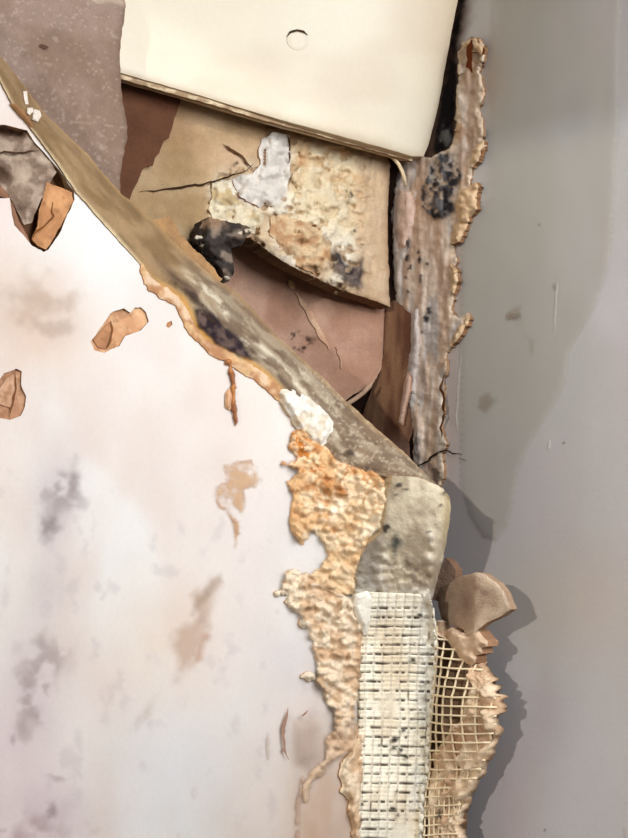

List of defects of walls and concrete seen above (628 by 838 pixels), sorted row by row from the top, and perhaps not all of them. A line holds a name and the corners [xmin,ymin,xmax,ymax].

water stain [421,0,464,219]
crack [139,144,253,192]
peeling [470,140,488,168]
flaking render [130,99,391,310]
peeling [451,182,484,245]
peeling [449,263,463,295]
peeling [91,308,148,353]
water stain [175,283,252,359]
peeling [449,315,474,347]
flaking render [438,572,517,636]